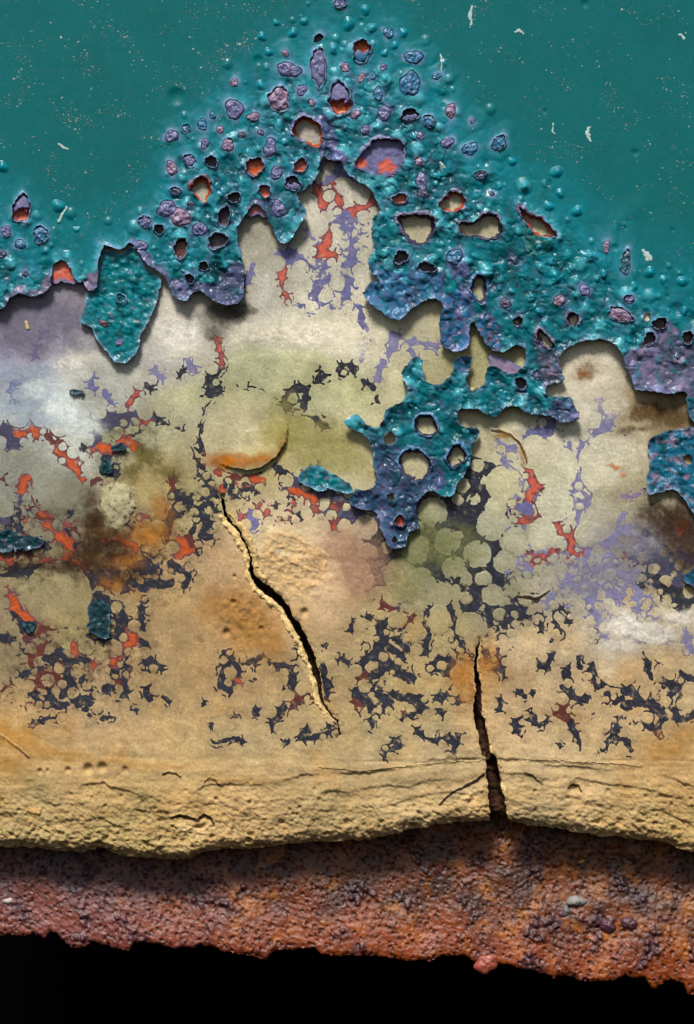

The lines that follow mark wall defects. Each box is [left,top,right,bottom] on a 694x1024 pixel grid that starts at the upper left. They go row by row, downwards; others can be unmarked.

rust [68,496,133,569]
crack [219,492,341,734]
peeling [0,157,694,763]
crack [318,641,643,820]
rust [0,816,694,995]